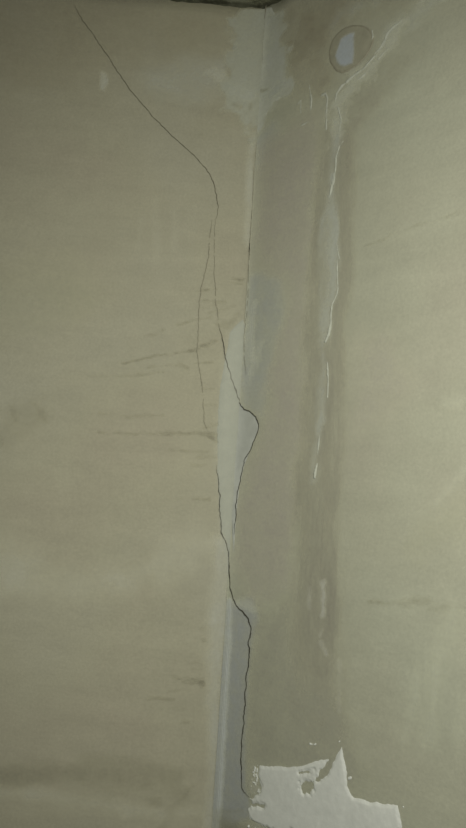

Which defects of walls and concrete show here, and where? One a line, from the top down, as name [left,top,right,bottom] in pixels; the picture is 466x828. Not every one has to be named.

crack [74,4,259,795]